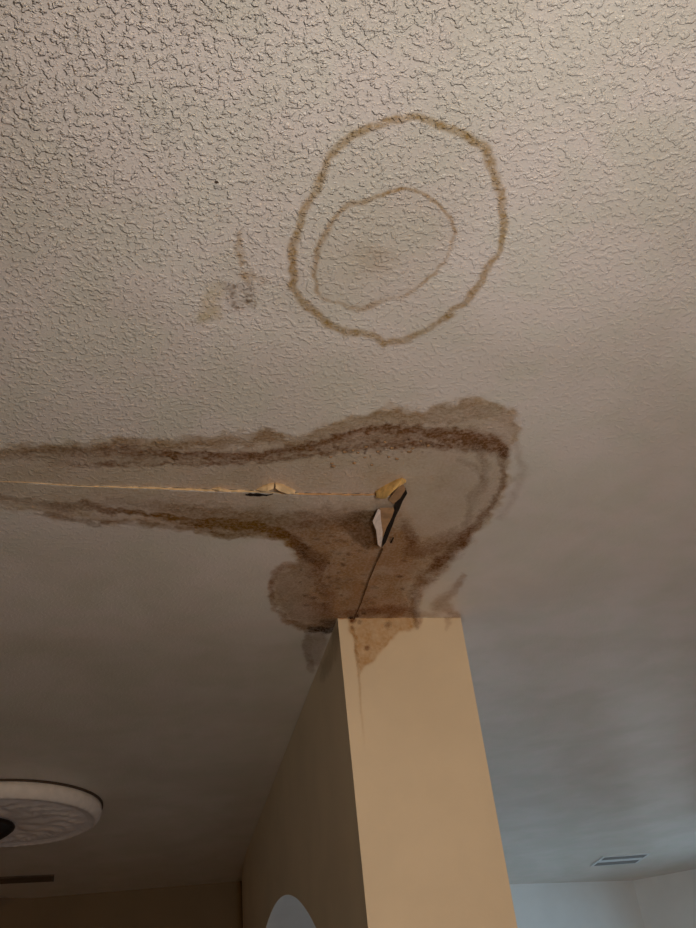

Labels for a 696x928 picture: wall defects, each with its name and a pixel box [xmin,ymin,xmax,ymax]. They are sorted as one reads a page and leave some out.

water stain [204,425,507,460]
crack [0,481,392,497]
water stain [195,518,303,548]
crack [353,537,394,620]